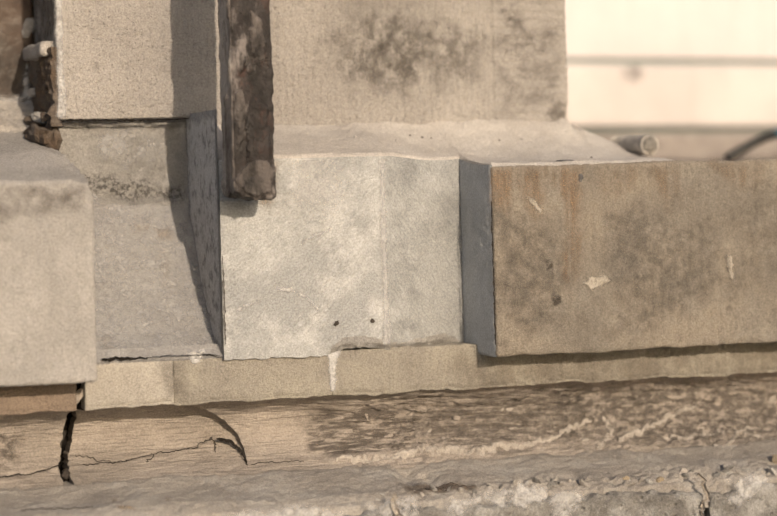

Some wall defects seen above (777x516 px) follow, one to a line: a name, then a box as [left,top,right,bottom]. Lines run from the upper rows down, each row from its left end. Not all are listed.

rust [233,10,266,77]
rust [231,89,276,201]
crack [0,383,304,482]